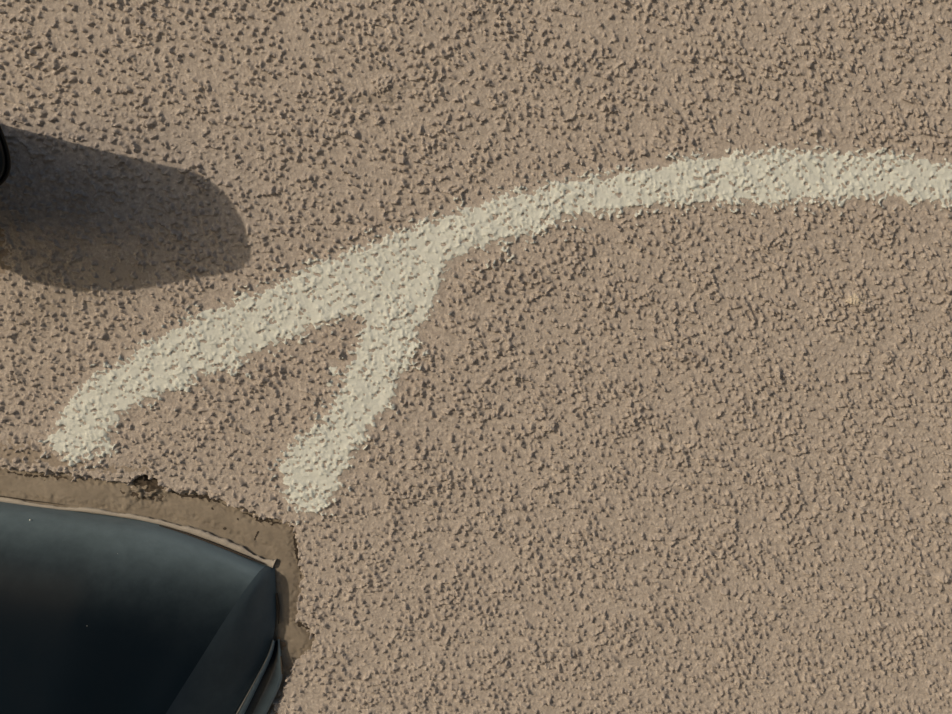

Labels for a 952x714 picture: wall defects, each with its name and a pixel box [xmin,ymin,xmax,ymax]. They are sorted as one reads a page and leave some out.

peeling [0,467,314,714]